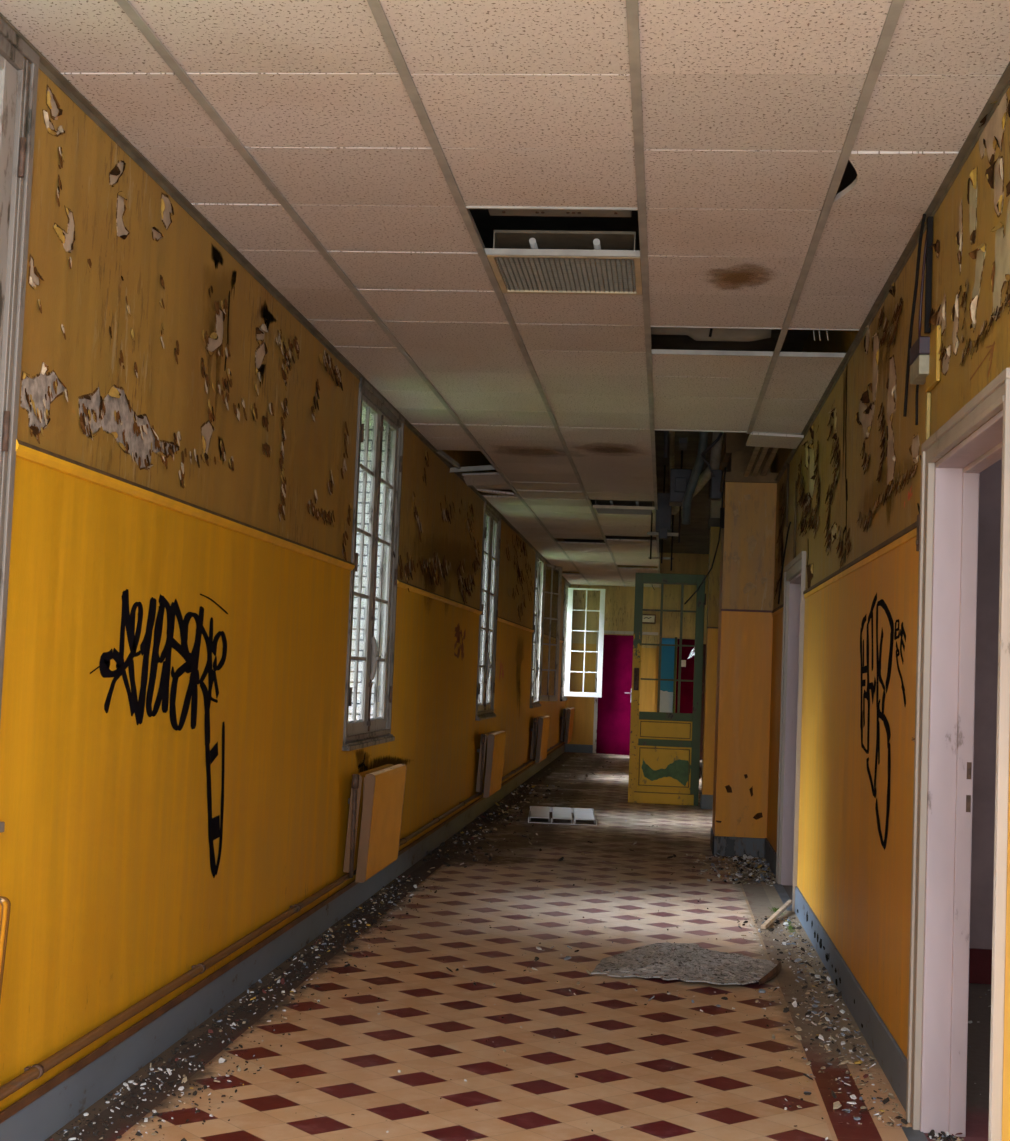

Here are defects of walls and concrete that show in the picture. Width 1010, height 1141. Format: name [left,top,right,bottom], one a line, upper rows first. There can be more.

peeling [28,255,44,314]
peeling [42,85,75,269]
peeling [109,160,129,240]
damp [713,266,767,288]
peeling [929,92,1010,376]
peeling [20,286,300,522]
peeling [311,350,343,422]
peeling [307,422,352,562]
peeling [774,282,920,599]
peeling [393,497,480,604]
peeling [641,759,691,786]